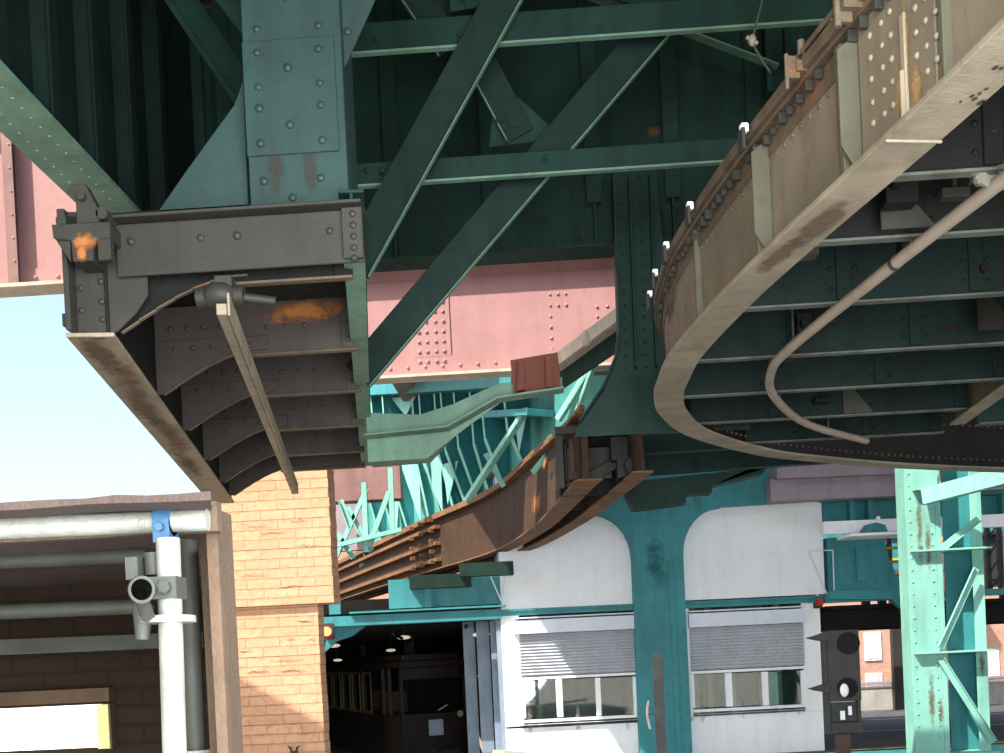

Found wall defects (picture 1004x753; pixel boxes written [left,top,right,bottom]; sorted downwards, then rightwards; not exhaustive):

corrosion [894,2,922,121]
corrosion [74,235,95,259]
corrosion [273,301,342,323]